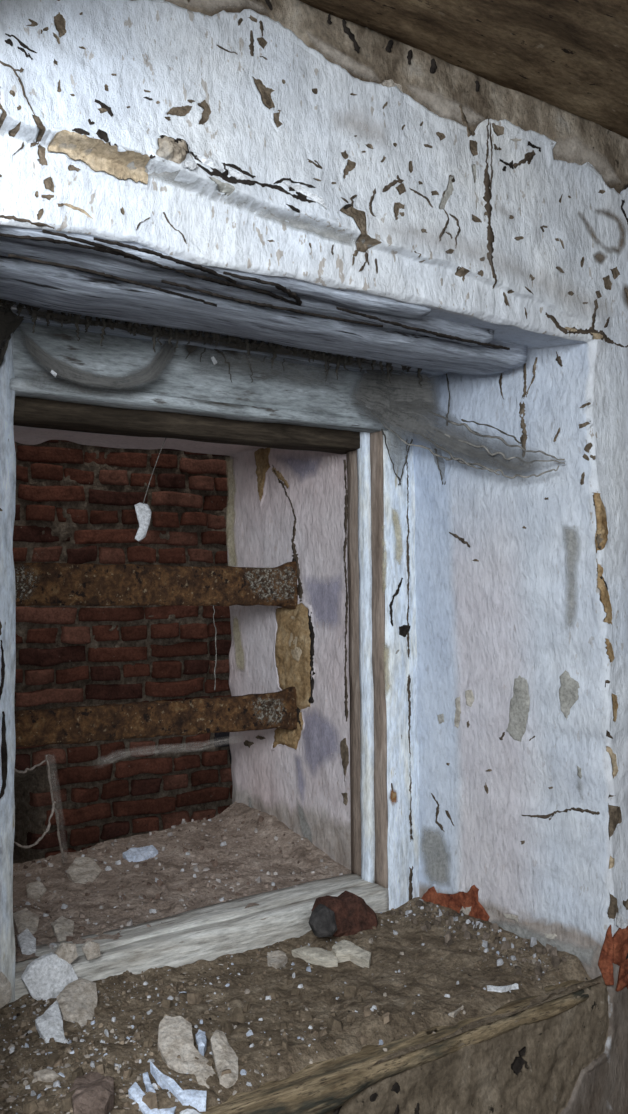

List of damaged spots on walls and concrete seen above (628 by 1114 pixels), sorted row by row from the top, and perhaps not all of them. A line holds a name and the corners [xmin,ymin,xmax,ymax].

peeling [0,86,238,222]
crack [190,151,461,249]
flaking render [100,0,628,307]
crack [545,307,628,347]
spalling [551,398,615,664]
flaking render [243,599,316,752]
crack [522,807,600,820]
flaking render [420,882,493,923]
flaking render [0,881,110,1110]
peeling [114,1053,201,1114]
flaking render [157,1002,267,1096]
flaking render [327,890,628,1114]